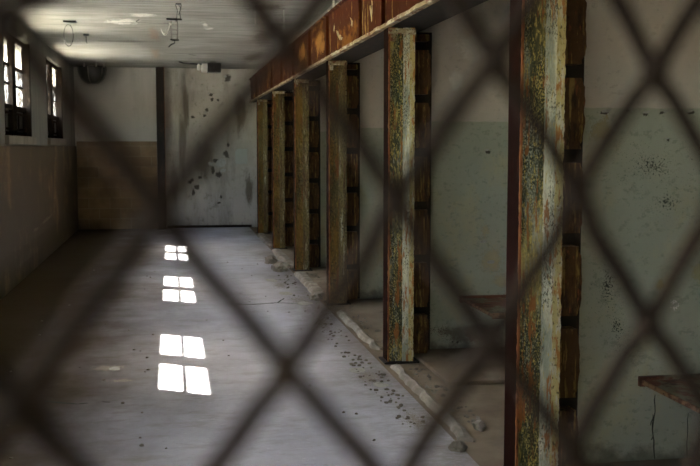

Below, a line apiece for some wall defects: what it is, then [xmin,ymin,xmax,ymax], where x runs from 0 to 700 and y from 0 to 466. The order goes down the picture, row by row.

corrosion [302,30,326,59]
crack [649,394,657,459]